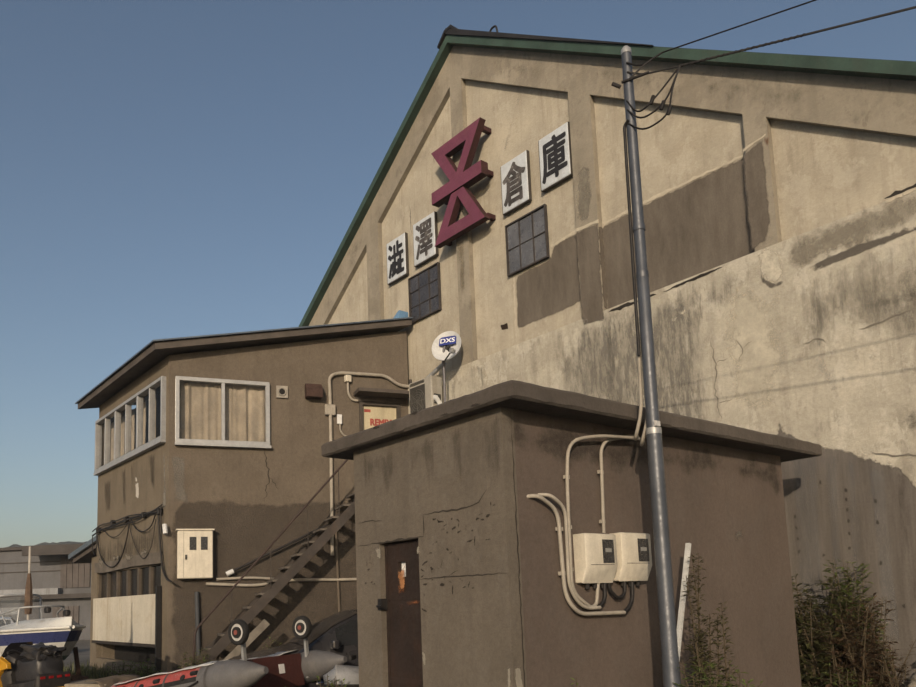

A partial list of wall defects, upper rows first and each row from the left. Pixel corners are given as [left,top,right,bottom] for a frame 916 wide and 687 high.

peeling [791,188,916,265]
damp [565,319,644,406]
damp [653,303,699,417]
crack [710,338,752,418]
crack [360,489,487,546]
crack [418,420,525,687]
peeling [781,445,916,687]